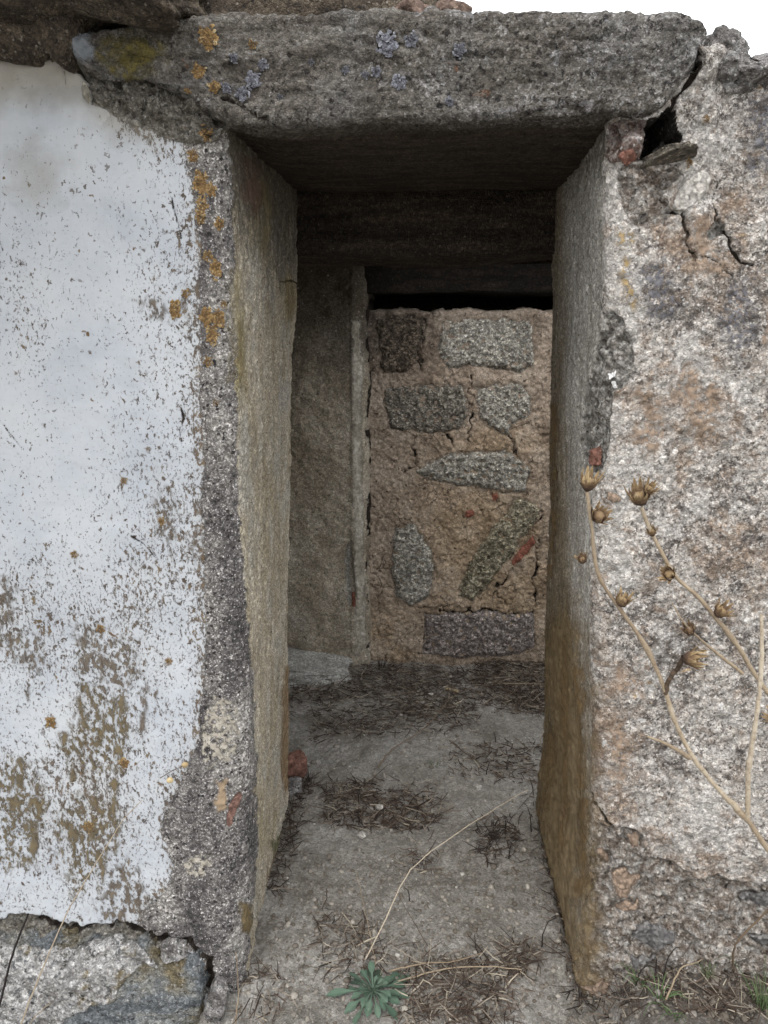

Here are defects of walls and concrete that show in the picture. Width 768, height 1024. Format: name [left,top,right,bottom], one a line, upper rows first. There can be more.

spalling [603,107,711,226]
crack [669,185,753,276]
peeling [0,56,259,995]